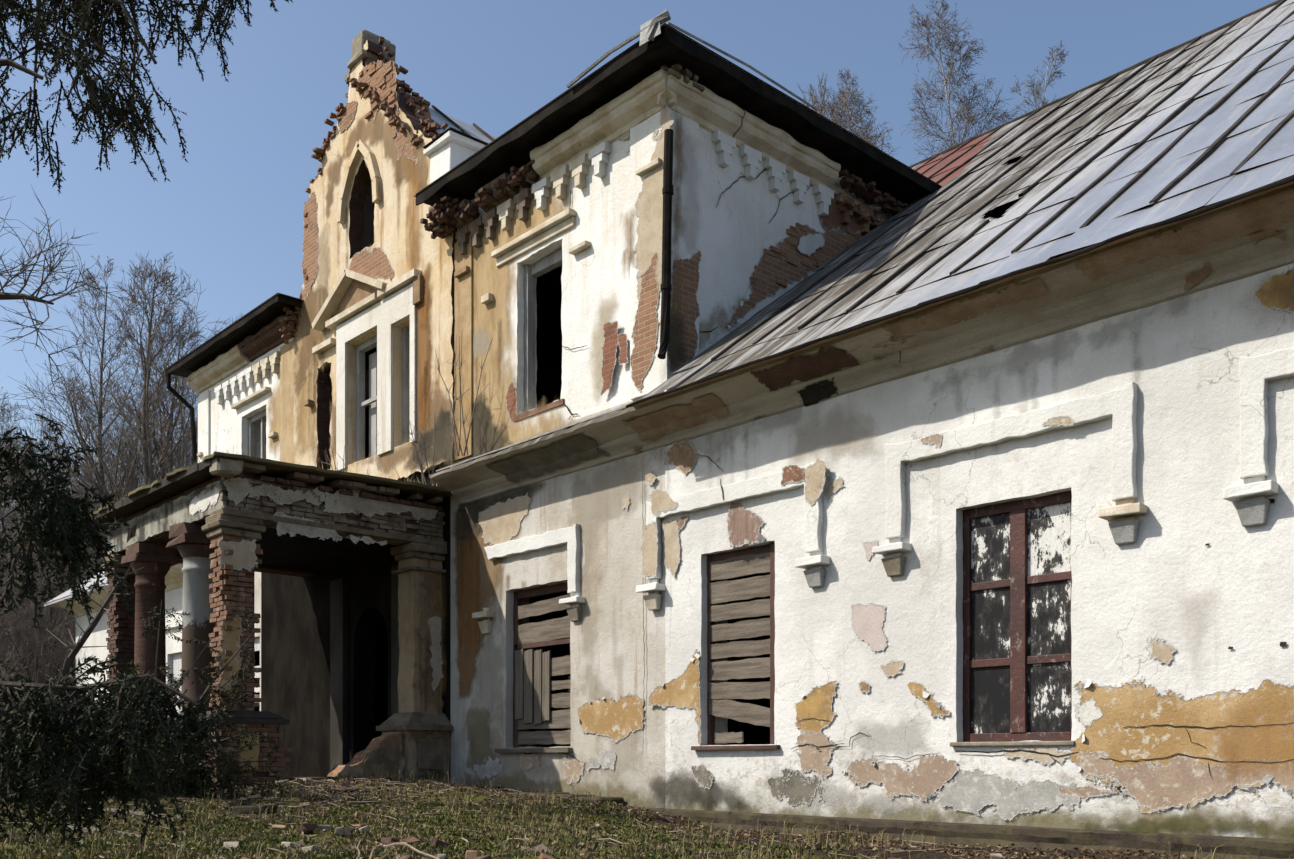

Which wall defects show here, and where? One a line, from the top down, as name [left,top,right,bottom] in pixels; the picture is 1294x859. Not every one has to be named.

flaking render [339,60,418,164]
flaking render [600,100,702,396]
crack [716,169,812,223]
flaking render [725,192,871,330]
flaking render [1251,266,1294,315]
spalling [726,502,765,548]
flaking render [850,602,950,718]
spalling [1145,636,1177,665]
flaking render [563,649,702,784]
flaking render [766,676,1294,821]
crack [790,718,1294,778]